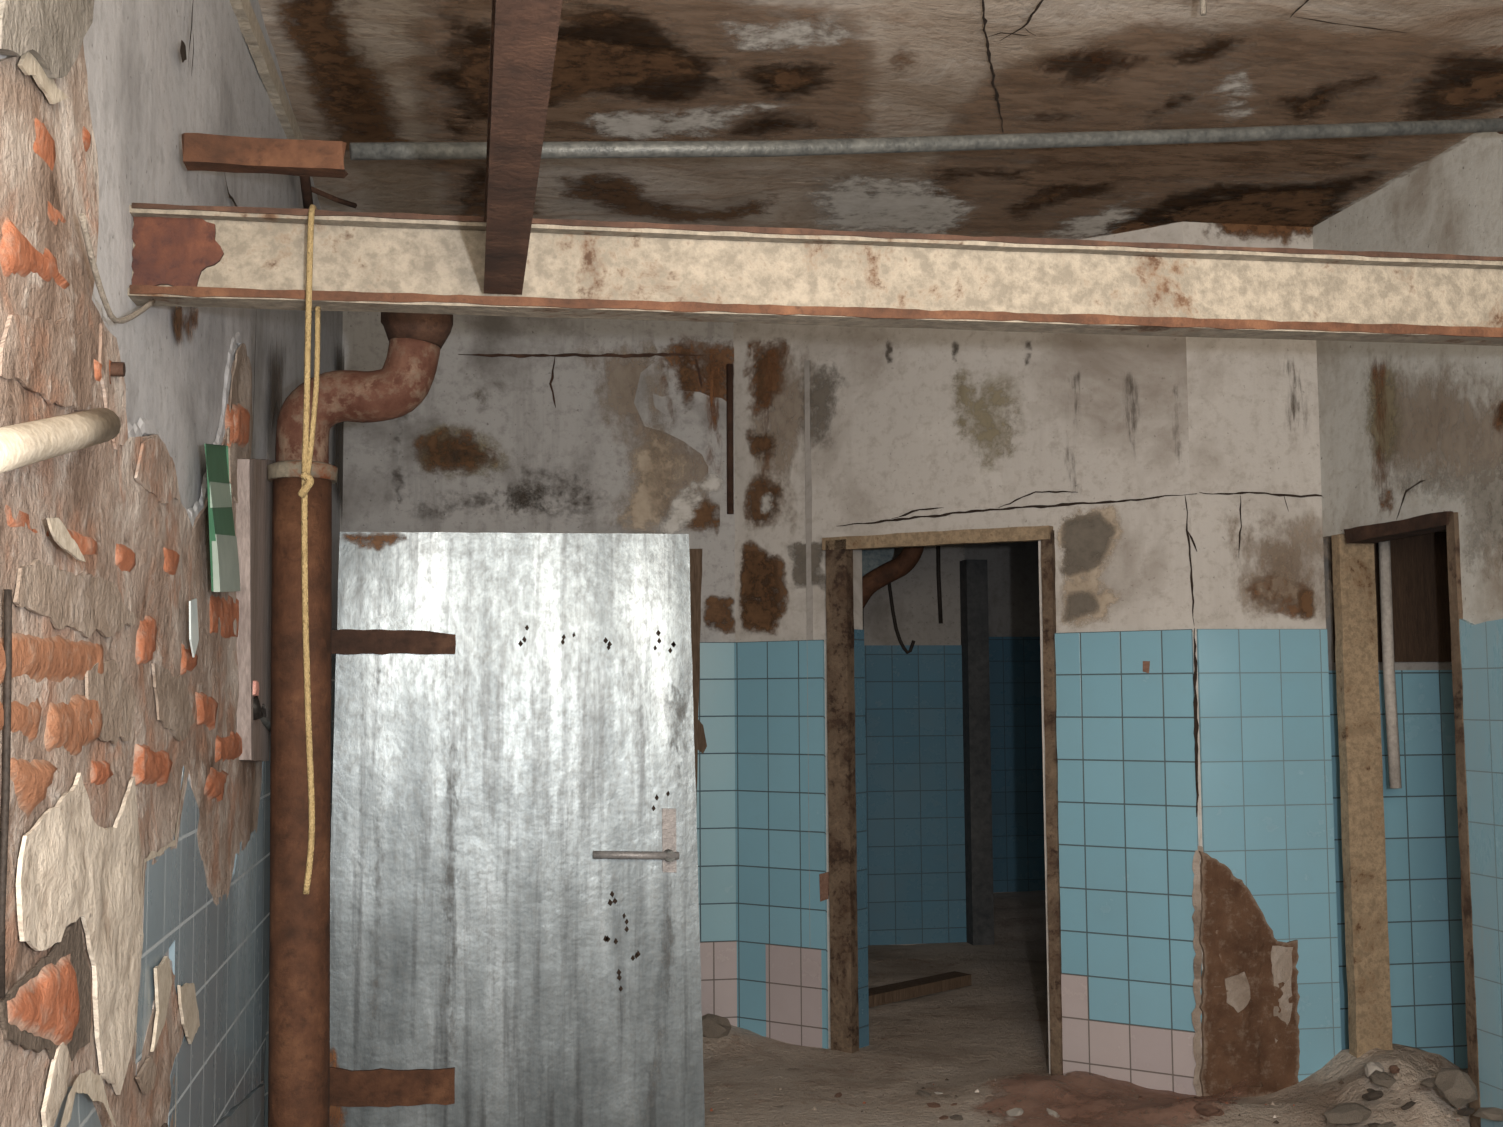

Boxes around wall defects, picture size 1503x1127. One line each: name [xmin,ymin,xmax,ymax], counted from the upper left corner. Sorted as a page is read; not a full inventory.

water stain [279,0,492,216]
water stain [543,0,873,142]
crack [982,0,1043,132]
water stain [912,20,1503,238]
corrosion [132,217,224,287]
corrosion [173,306,198,343]
spalling [0,43,262,1127]
corrosion [345,533,406,550]
spalling [704,542,788,634]
crack [841,491,1322,817]
spalling [1057,506,1122,625]
spalling [1192,846,1300,1098]